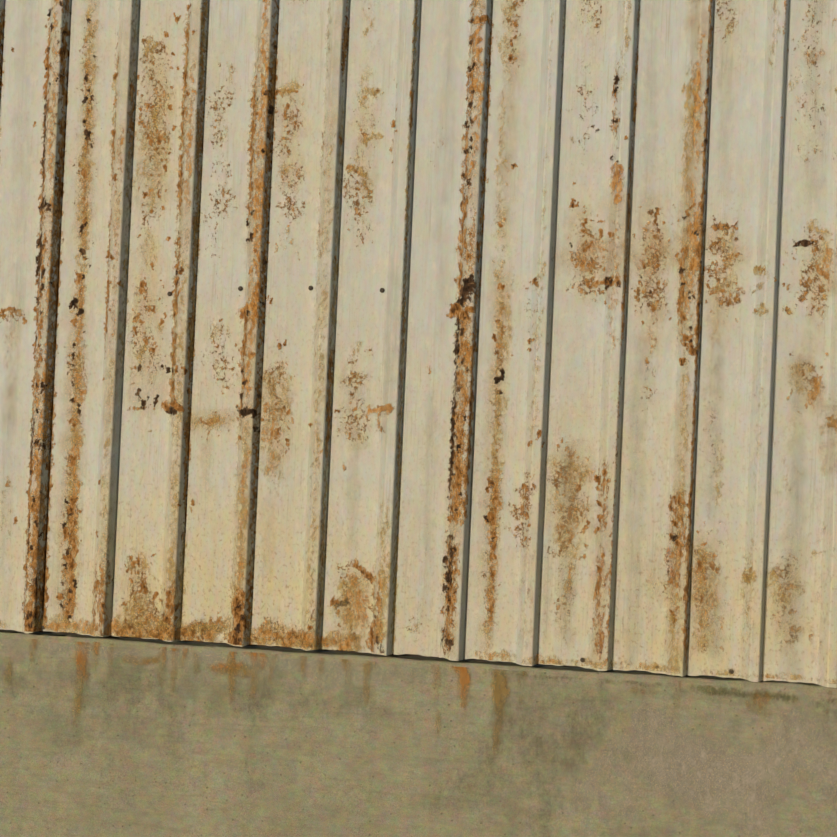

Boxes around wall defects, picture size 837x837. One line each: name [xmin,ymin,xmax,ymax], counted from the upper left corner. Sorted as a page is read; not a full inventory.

corrosion [410,3,419,133]
corrosion [446,0,524,526]
corrosion [753,222,833,315]
corrosion [566,0,761,671]
corrosion [790,363,824,408]
corrosion [483,303,536,633]
corrosion [441,535,460,655]
corrosion [547,431,618,668]
corrosion [770,558,801,622]